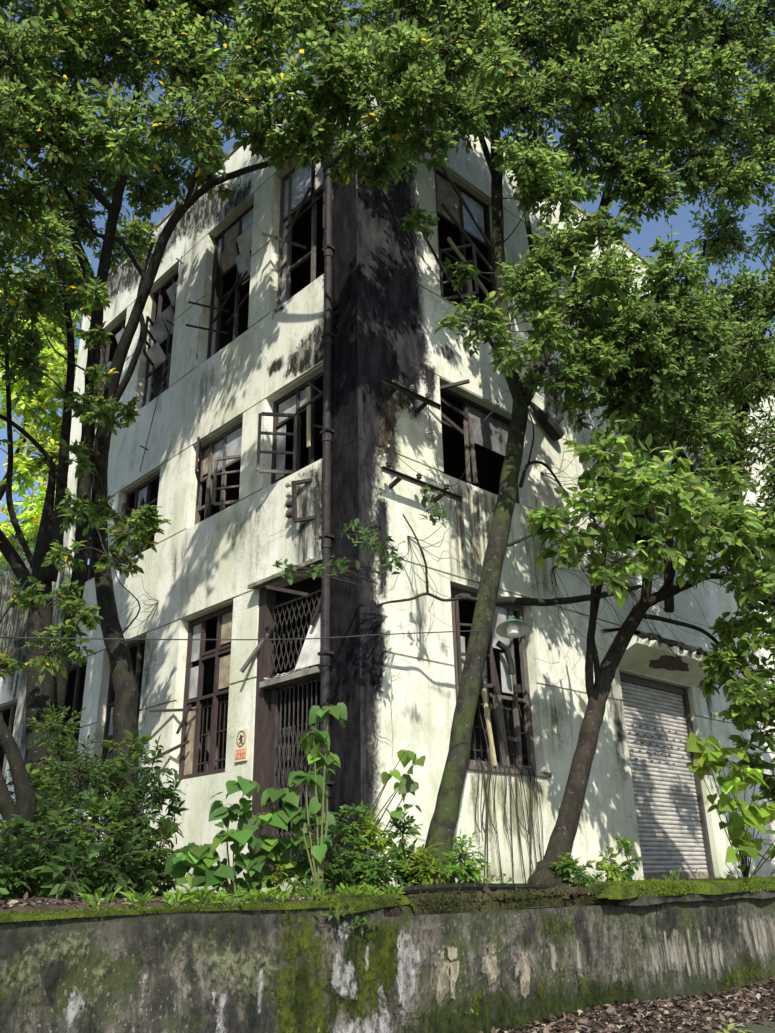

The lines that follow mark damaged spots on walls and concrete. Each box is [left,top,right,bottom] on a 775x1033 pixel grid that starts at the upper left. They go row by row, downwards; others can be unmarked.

water stain [107,180,251,307]
water stain [268,268,335,377]
water stain [403,363,437,418]
water stain [381,410,400,478]
water stain [369,499,389,695]
water stain [67,992,96,1033]
water stain [134,910,269,977]
water stain [188,969,274,1033]
water stain [331,932,420,1033]
spalling [433,945,460,1002]
spalling [480,940,500,985]
spalling [512,952,531,999]